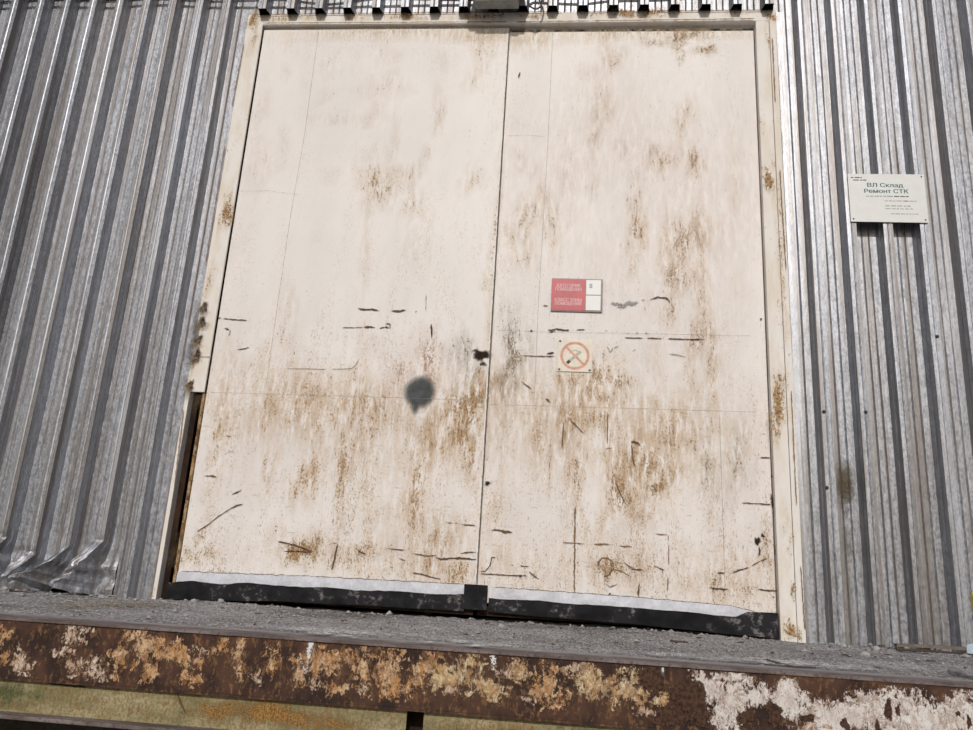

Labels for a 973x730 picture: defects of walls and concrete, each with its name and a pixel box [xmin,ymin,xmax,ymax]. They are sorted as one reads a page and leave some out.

rust [762,167,787,287]
rust [192,307,205,364]
rust [207,301,531,579]
rust [768,370,797,504]
rust [523,353,744,592]
rust [442,561,469,583]
rust [192,700,367,730]
rust [634,666,711,728]
rust [736,698,783,729]
peeling [688,669,973,730]